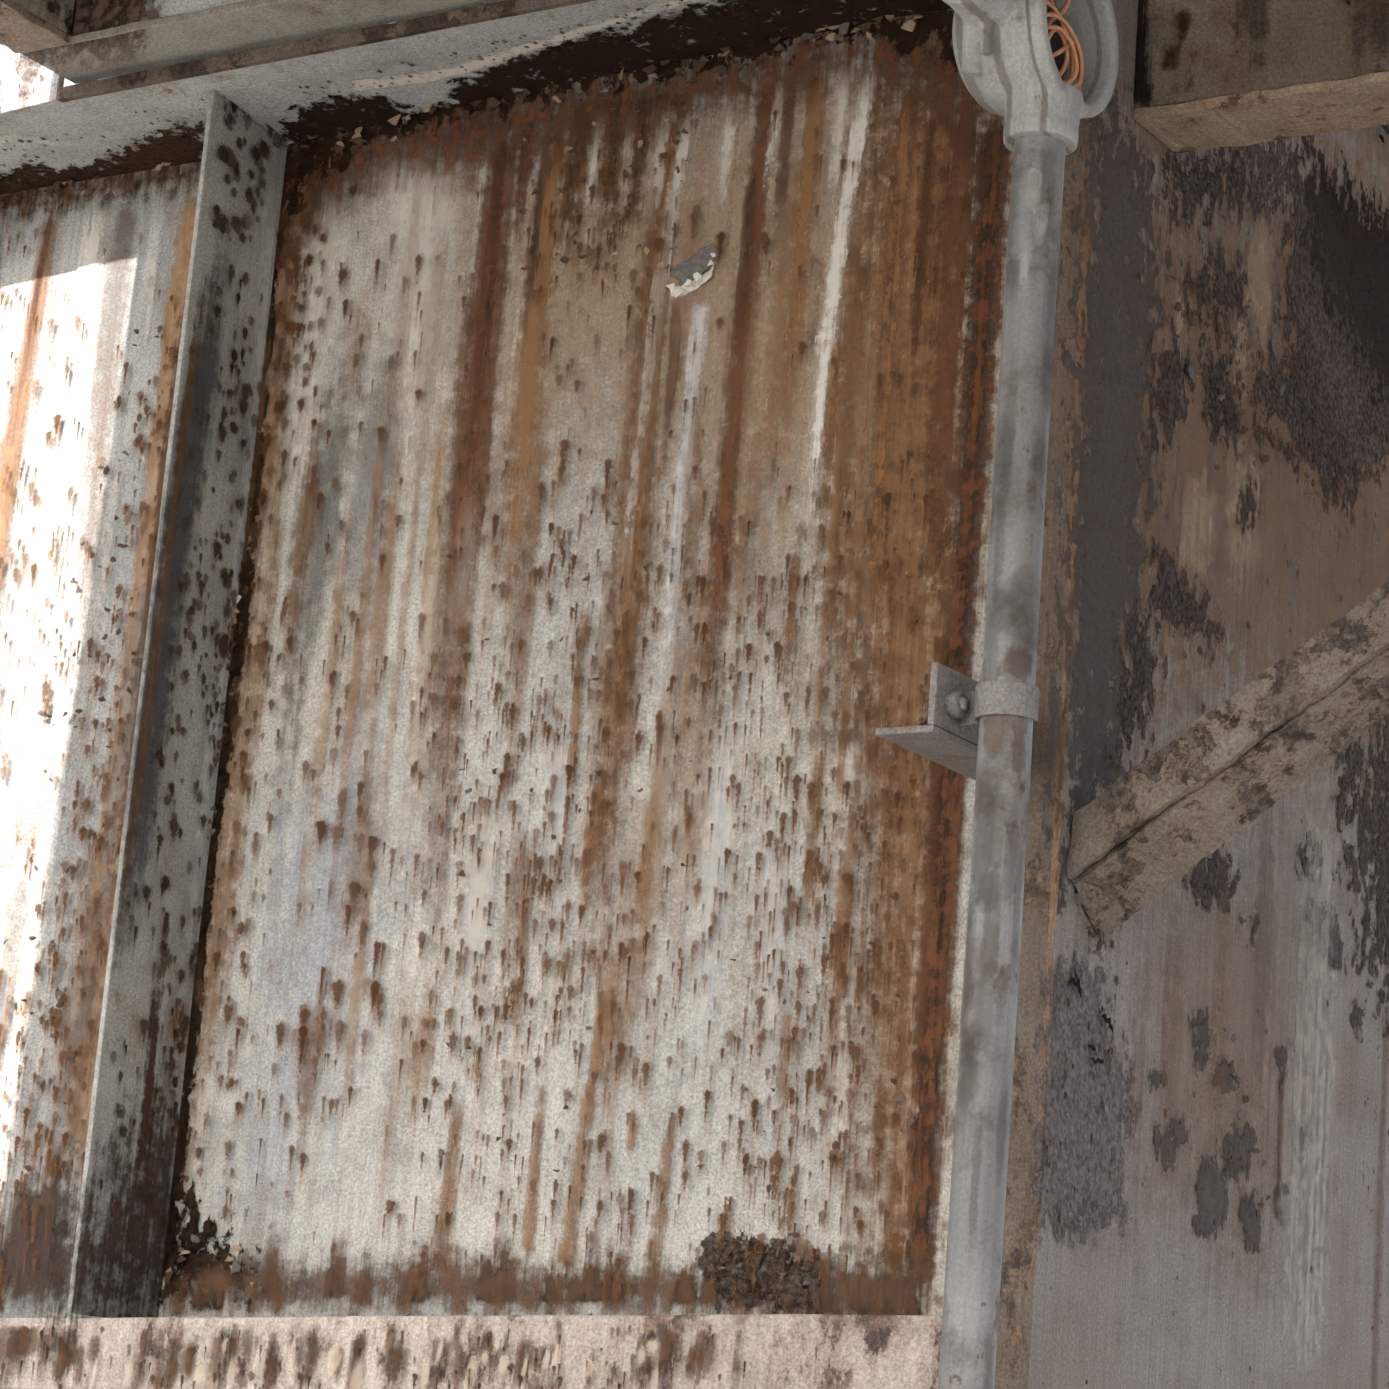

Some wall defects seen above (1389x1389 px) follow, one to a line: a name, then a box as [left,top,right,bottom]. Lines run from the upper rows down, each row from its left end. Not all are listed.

rust [0,0,1011,1389]
peeling [666,243,721,298]